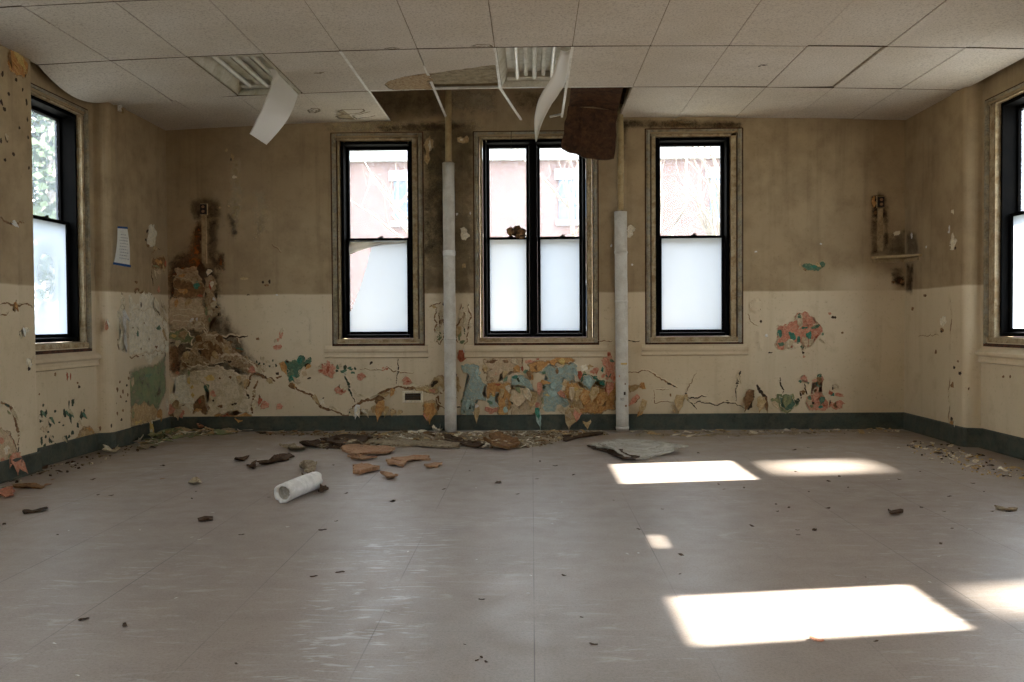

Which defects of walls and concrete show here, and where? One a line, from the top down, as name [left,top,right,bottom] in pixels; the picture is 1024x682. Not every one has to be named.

peeling [386,74,431,90]
peeling [38,224,367,447]
crack [160,274,462,416]
peeling [401,301,647,430]
crack [628,369,745,409]
peeling [743,373,846,413]
peeling [768,310,837,358]
peeling [0,427,29,475]